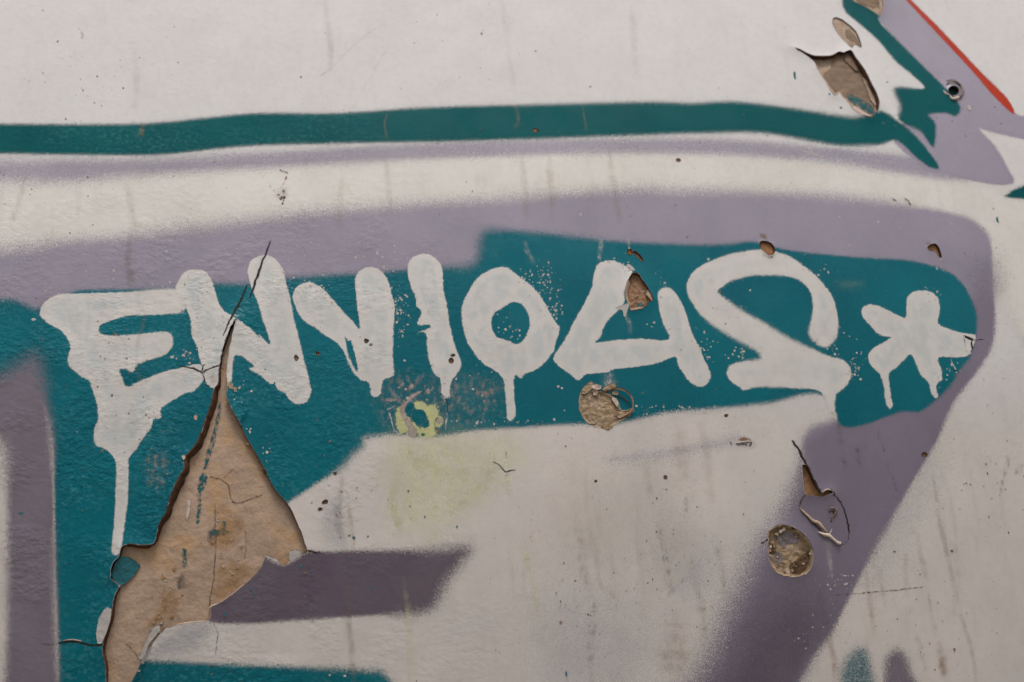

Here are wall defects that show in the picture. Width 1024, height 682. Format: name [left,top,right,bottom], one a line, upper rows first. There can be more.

peeling [853,0,884,15]
peeling [795,17,879,118]
crack [223,241,271,337]
spalling [616,247,654,317]
peeling [760,236,776,255]
peeling [927,243,942,260]
crack [179,365,219,386]
spalling [579,380,634,430]
peeling [96,326,308,682]
spalling [761,440,850,577]